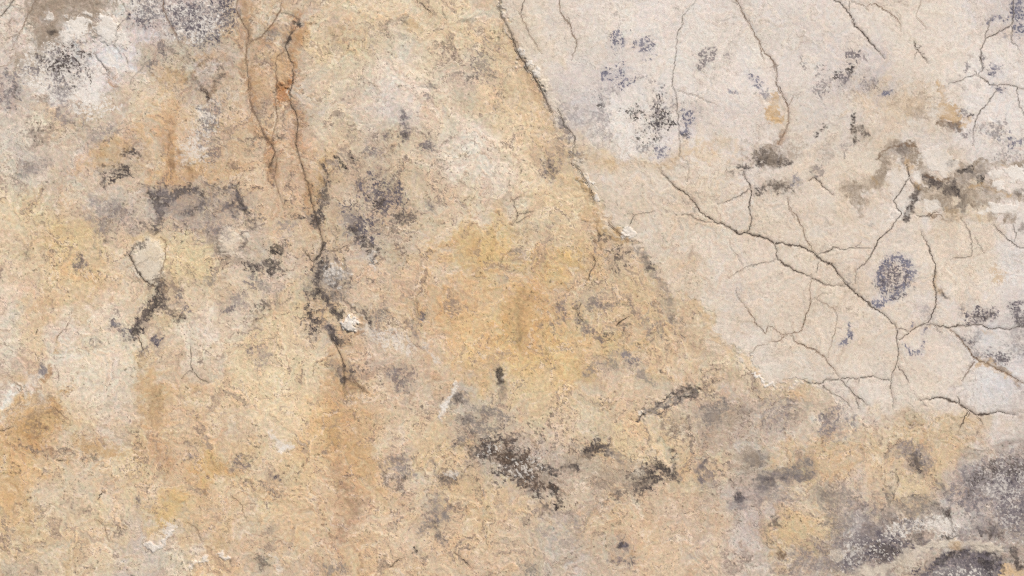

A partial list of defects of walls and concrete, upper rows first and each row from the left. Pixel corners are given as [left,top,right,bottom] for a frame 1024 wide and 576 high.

crack [235,0,355,263]
crack [329,335,370,398]
crack [496,0,656,242]
leakage [381,363,1024,576]
leakage [536,26,1024,234]
crack [661,0,1024,428]
leakage [867,251,919,310]